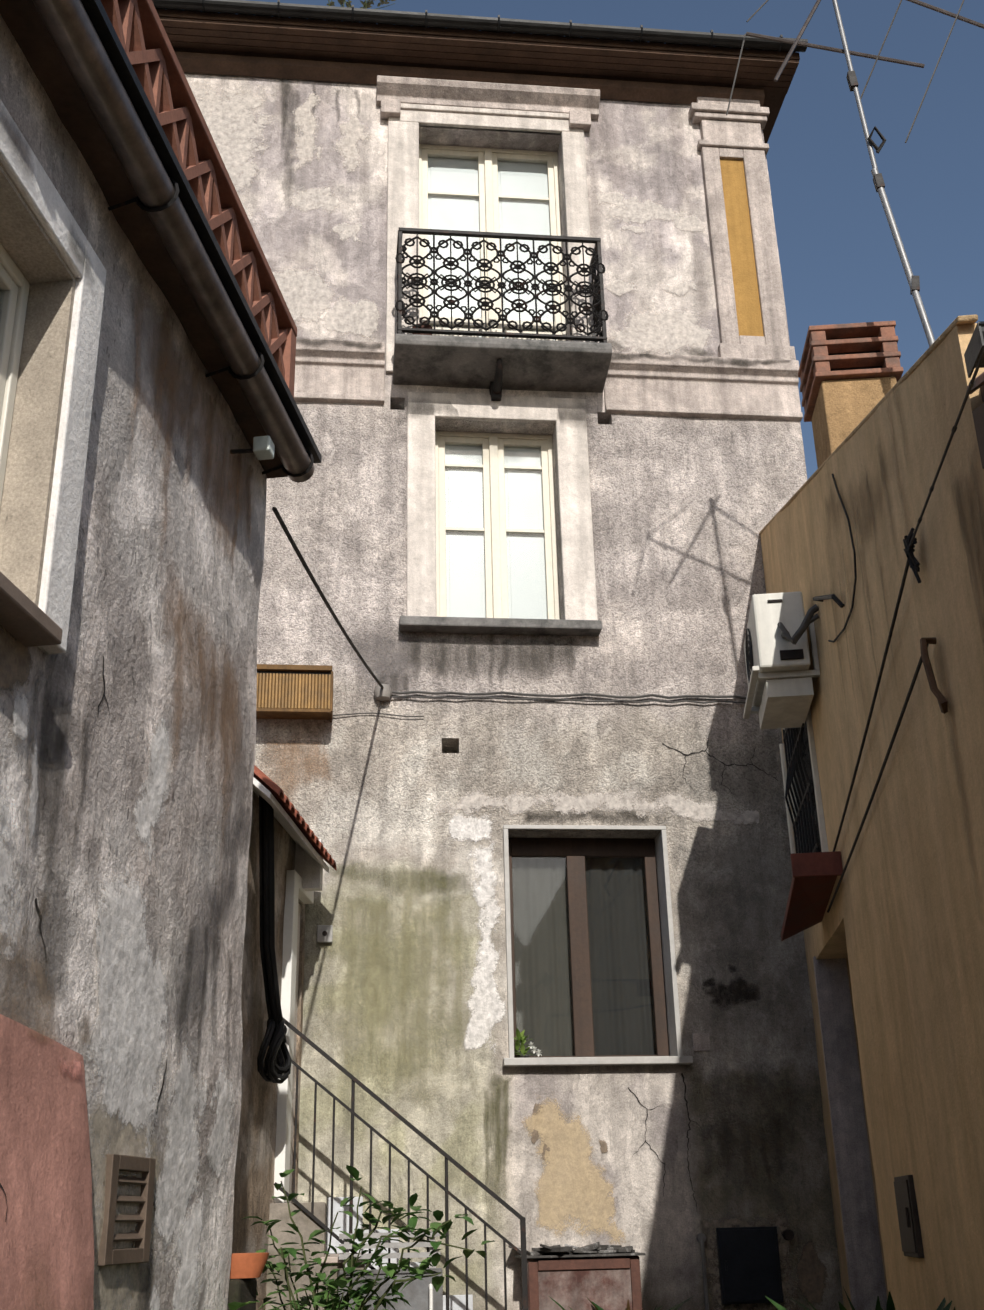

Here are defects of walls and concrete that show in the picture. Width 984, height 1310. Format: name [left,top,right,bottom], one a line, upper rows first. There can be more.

crack [662,735,778,801]
flaking render [449,814,506,1052]
flaking render [525,1099,625,1241]
crack [628,1073,703,1208]